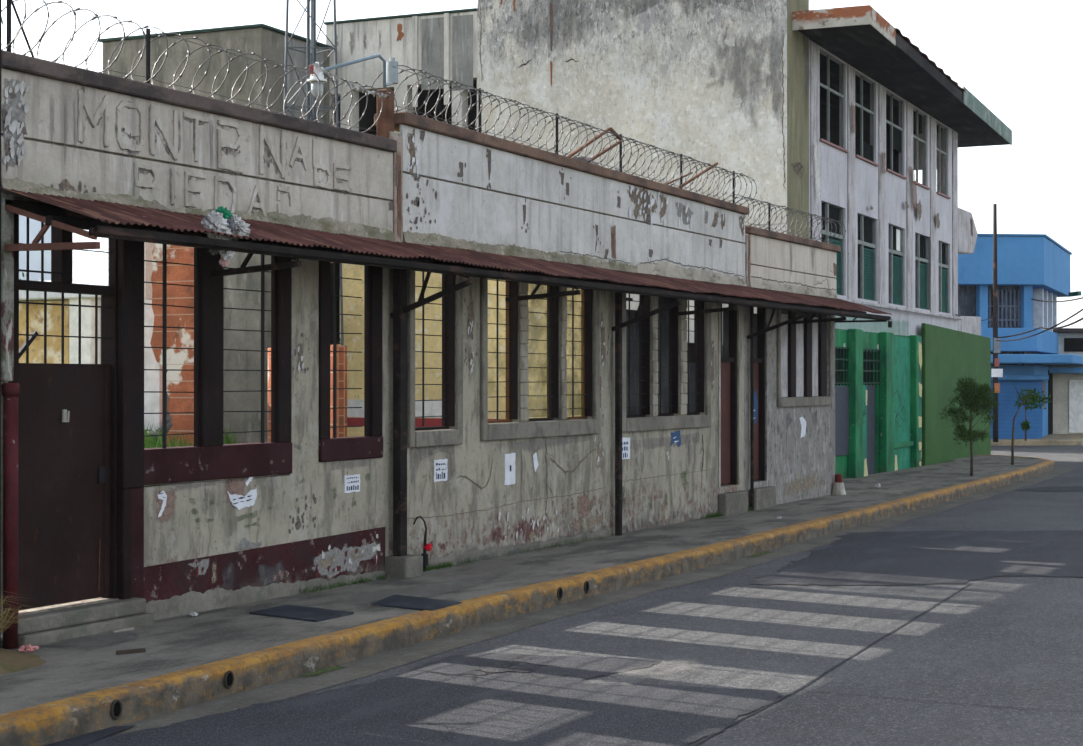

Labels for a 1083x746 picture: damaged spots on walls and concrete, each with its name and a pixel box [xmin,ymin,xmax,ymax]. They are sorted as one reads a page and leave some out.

peeling [2,78,30,168]
spalling [403,129,838,299]
spalling [145,534,385,621]